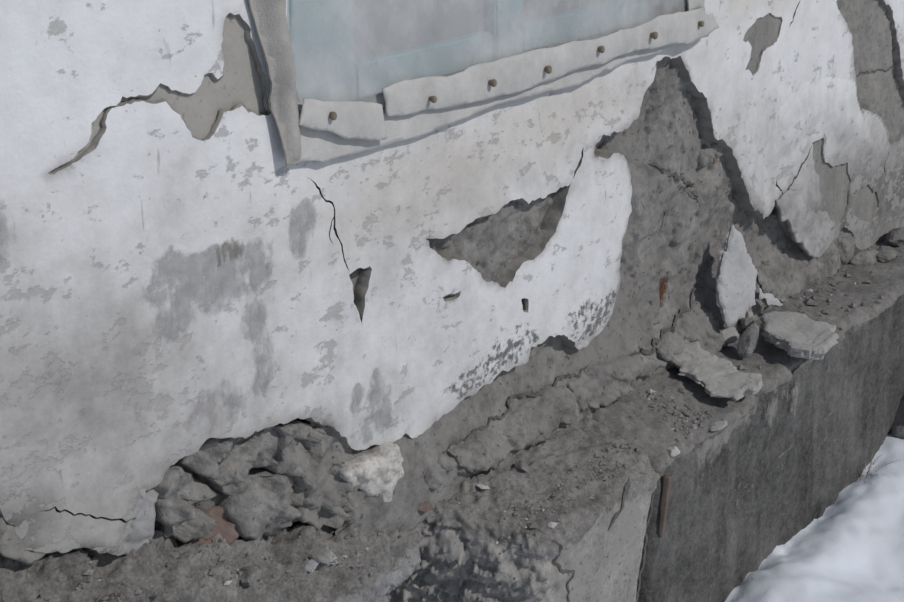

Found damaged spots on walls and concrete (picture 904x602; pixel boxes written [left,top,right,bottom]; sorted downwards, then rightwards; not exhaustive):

spalling [48,13,271,174]
spalling [743,13,782,75]
spalling [836,0,904,145]
crack [308,178,350,276]
spalling [116,56,879,557]
spalling [0,509,45,565]
crack [39,506,137,523]
crack [553,540,575,602]